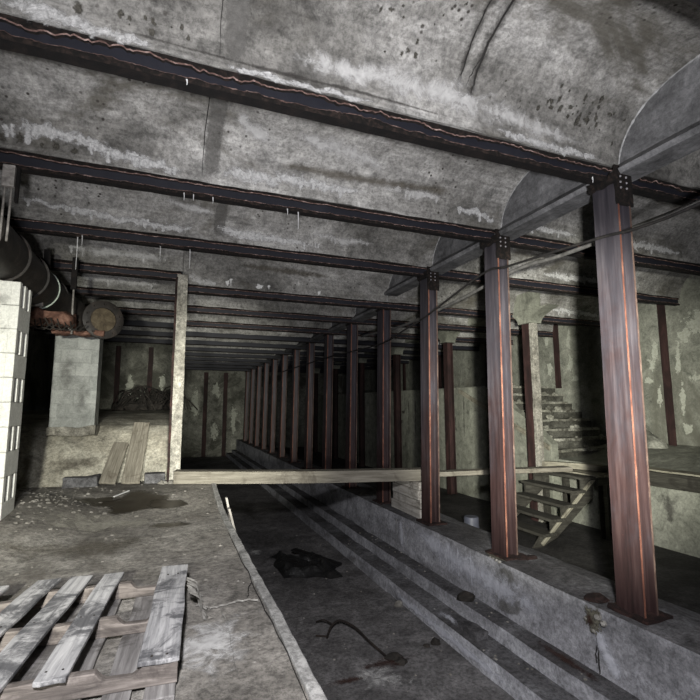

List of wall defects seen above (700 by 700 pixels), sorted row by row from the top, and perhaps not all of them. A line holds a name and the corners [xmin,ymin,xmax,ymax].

leakage [202,0,478,114]
crack [458,0,515,111]
spalling [517,83,604,132]
leakage [2,121,180,175]
leakage [457,206,494,223]
flaking render [644,340,663,408]
flaking render [675,307,700,435]
leakage [54,491,187,531]